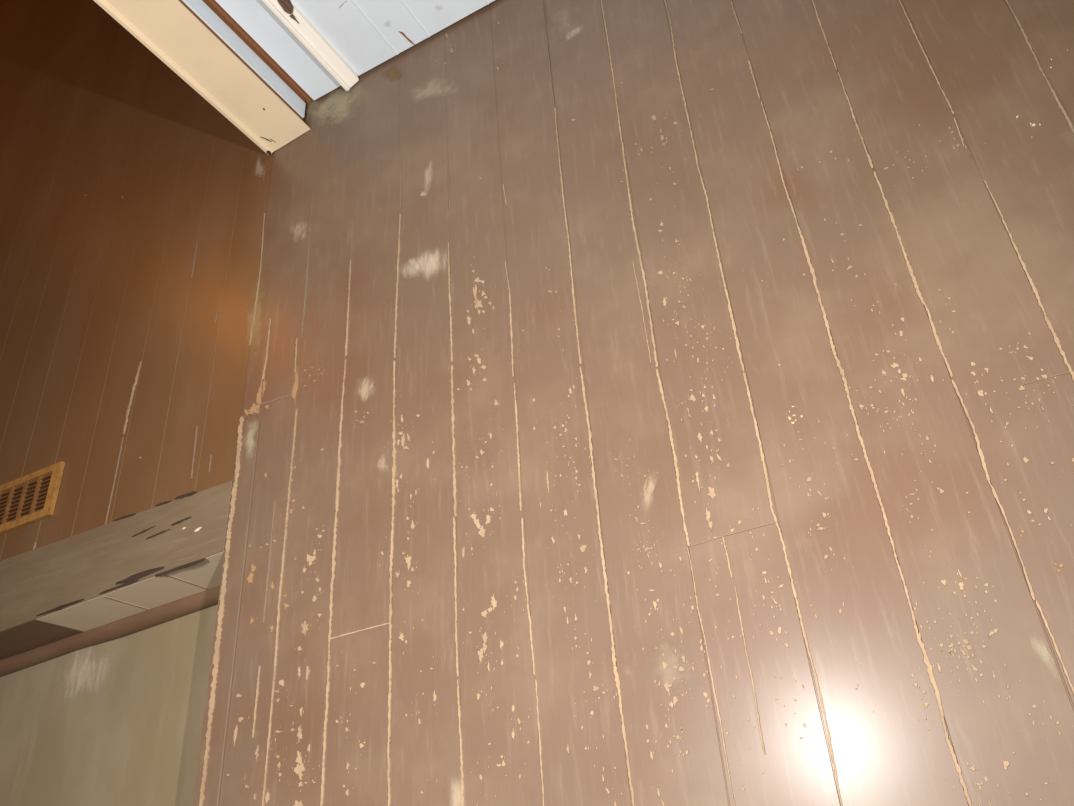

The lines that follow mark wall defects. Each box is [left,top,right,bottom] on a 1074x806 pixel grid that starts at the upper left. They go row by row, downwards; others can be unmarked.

peeling [467,264,496,334]
peeling [450,349,487,392]
peeling [849,317,944,524]
peeling [965,332,1056,429]
peeling [266,525,325,610]
peeling [379,473,420,593]
peeling [460,483,501,558]
peeling [297,614,322,688]
peeling [463,593,524,673]
peeling [564,606,617,730]
peeling [911,570,1010,730]
peeling [271,679,320,806]